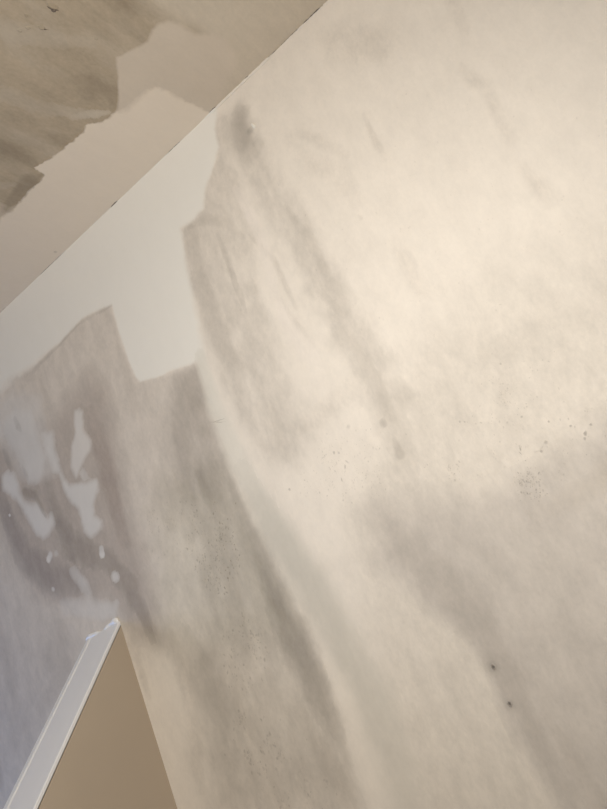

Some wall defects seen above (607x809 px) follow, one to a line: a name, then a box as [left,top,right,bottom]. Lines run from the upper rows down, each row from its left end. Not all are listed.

damp [0,0,211,213]
peeling [0,387,104,542]
damp [0,363,168,809]